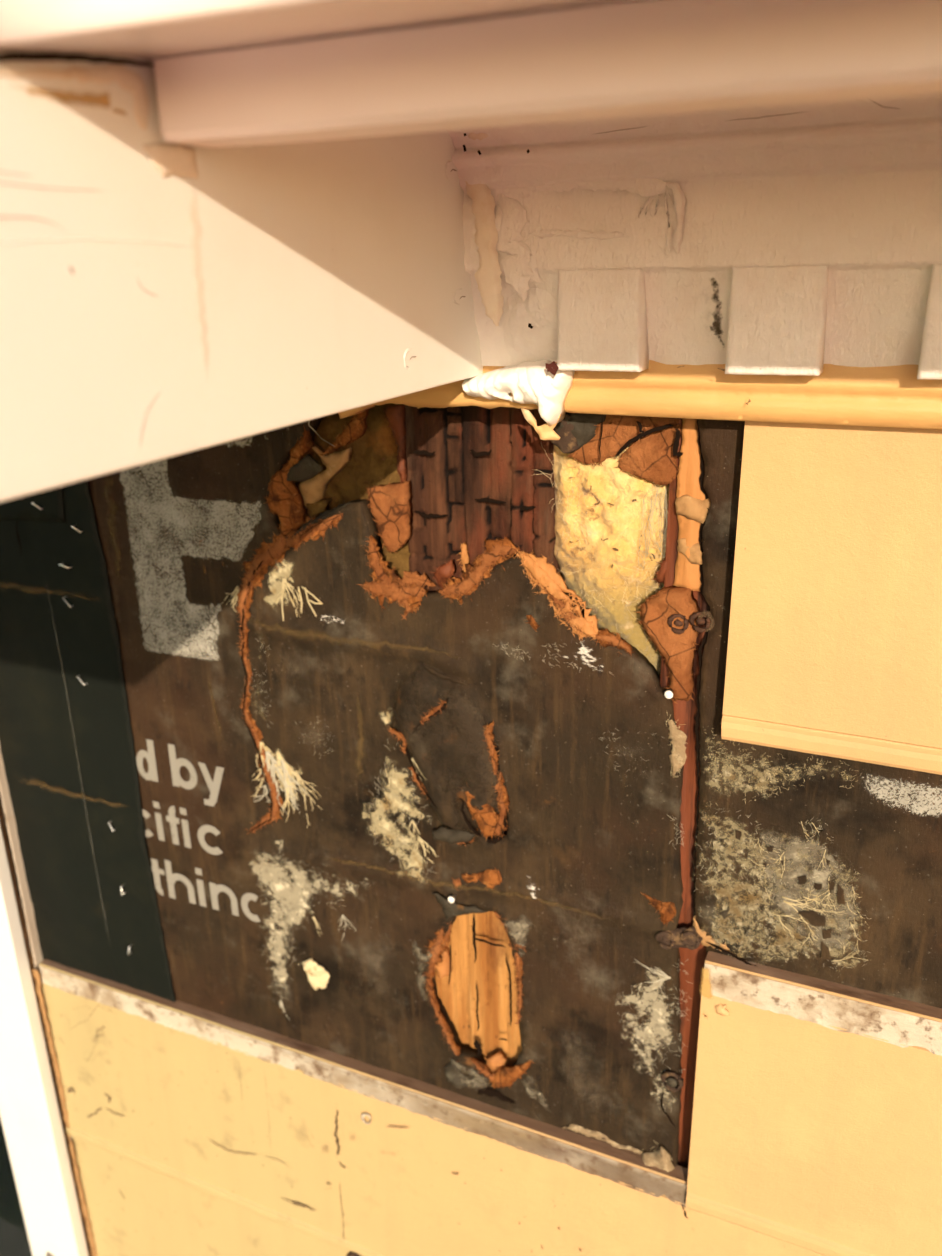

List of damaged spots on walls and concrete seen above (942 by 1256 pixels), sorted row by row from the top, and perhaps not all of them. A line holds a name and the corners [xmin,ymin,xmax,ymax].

peeling [263,404,413,553]
peeling [521,408,561,440]
peeling [567,415,682,486]
leakage [249,741,493,1020]
mould [696,728,872,970]
peeling [434,947,452,980]
peeling [484,1051,507,1073]
leakage [615,959,678,1112]